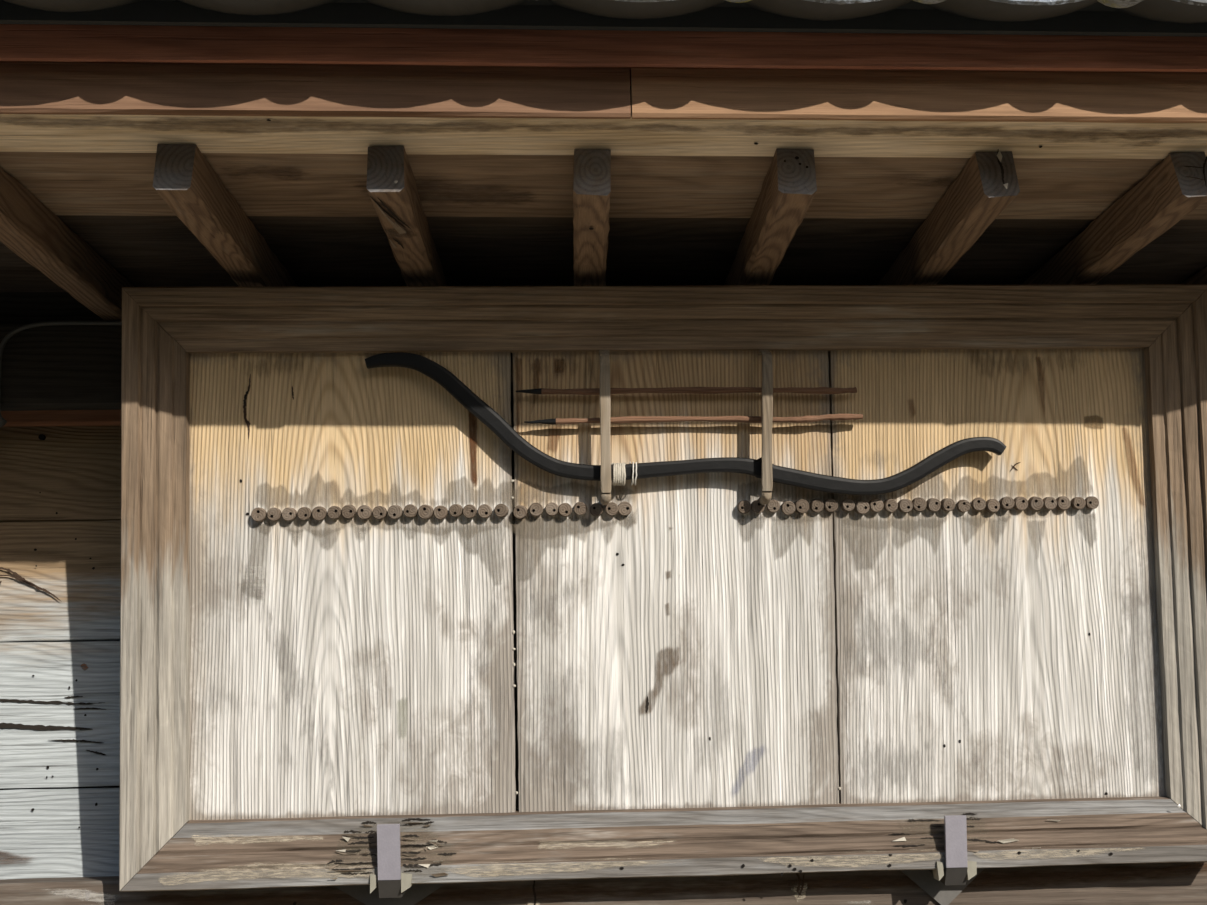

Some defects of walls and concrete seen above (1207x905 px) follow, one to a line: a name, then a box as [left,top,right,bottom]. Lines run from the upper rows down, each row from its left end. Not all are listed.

crack [243,374,251,439]
crack [0,567,61,601]
crack [0,696,106,755]
peeling [325,837,366,880]
peeling [402,822,448,877]